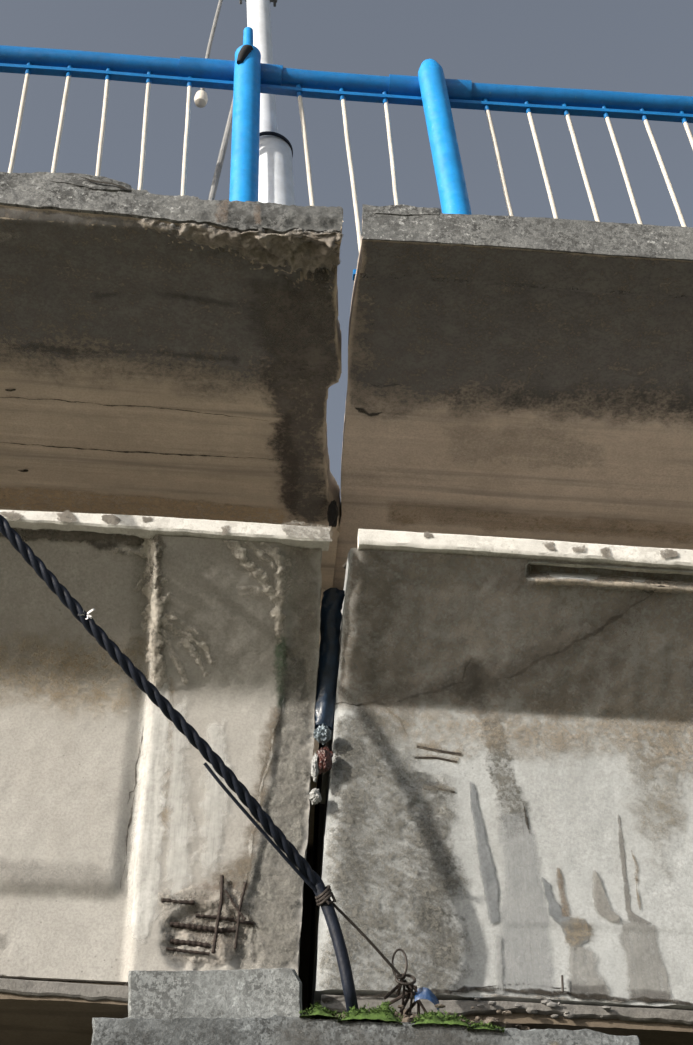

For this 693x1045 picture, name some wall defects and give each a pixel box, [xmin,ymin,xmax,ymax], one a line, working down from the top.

spalling [140,218,343,278]
crack [0,397,264,421]
crack [0,442,272,460]
damp [0,268,338,524]
crack [334,582,671,732]
damp [0,535,215,938]
crack [120,694,147,888]
damp [202,726,261,888]
damp [254,707,282,805]
damp [470,782,499,923]
damp [542,868,609,995]
damp [593,815,670,1000]